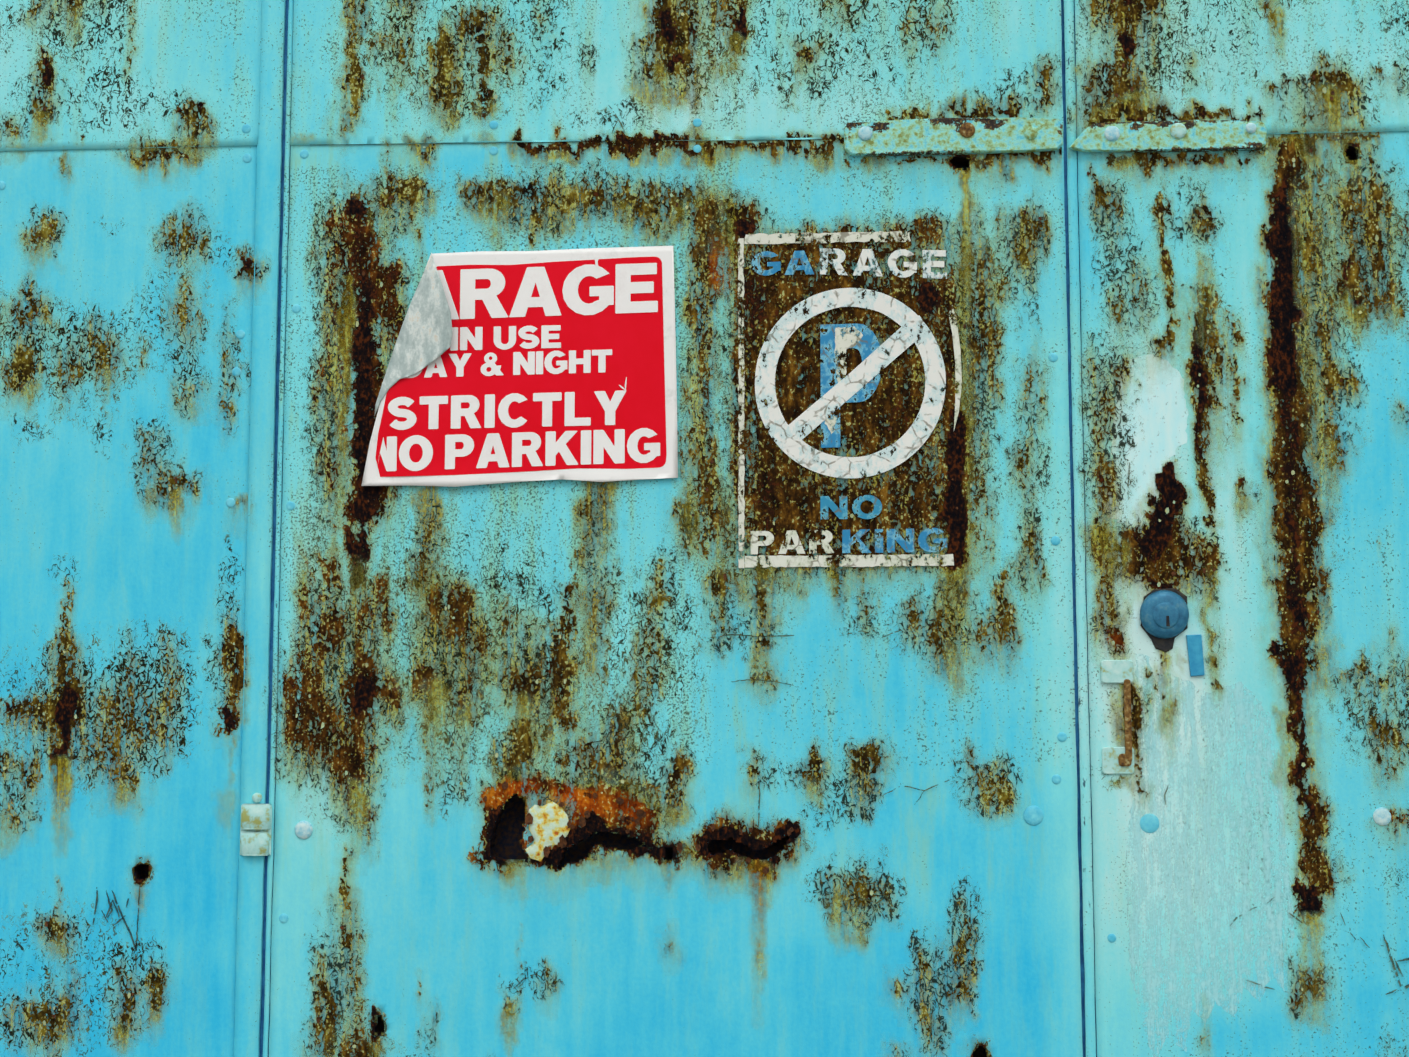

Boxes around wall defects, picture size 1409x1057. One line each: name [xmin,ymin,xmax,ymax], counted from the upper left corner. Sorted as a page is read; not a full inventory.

corrosion [0,0,958,1057]
corrosion [826,195,1053,682]
corrosion [885,0,1409,935]
spalling [484,781,794,874]
corrosion [1282,951,1335,1020]